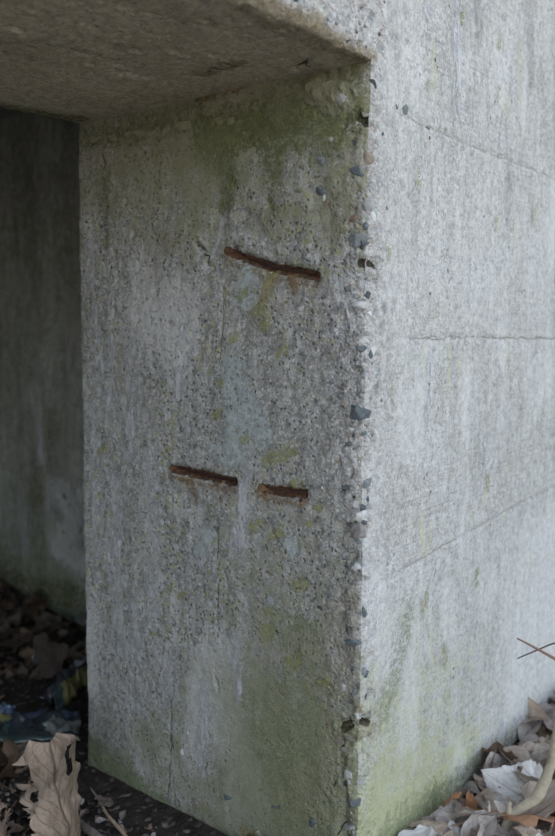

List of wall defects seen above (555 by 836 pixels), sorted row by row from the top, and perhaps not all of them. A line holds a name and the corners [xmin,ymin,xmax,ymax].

damp [227,468,250,565]